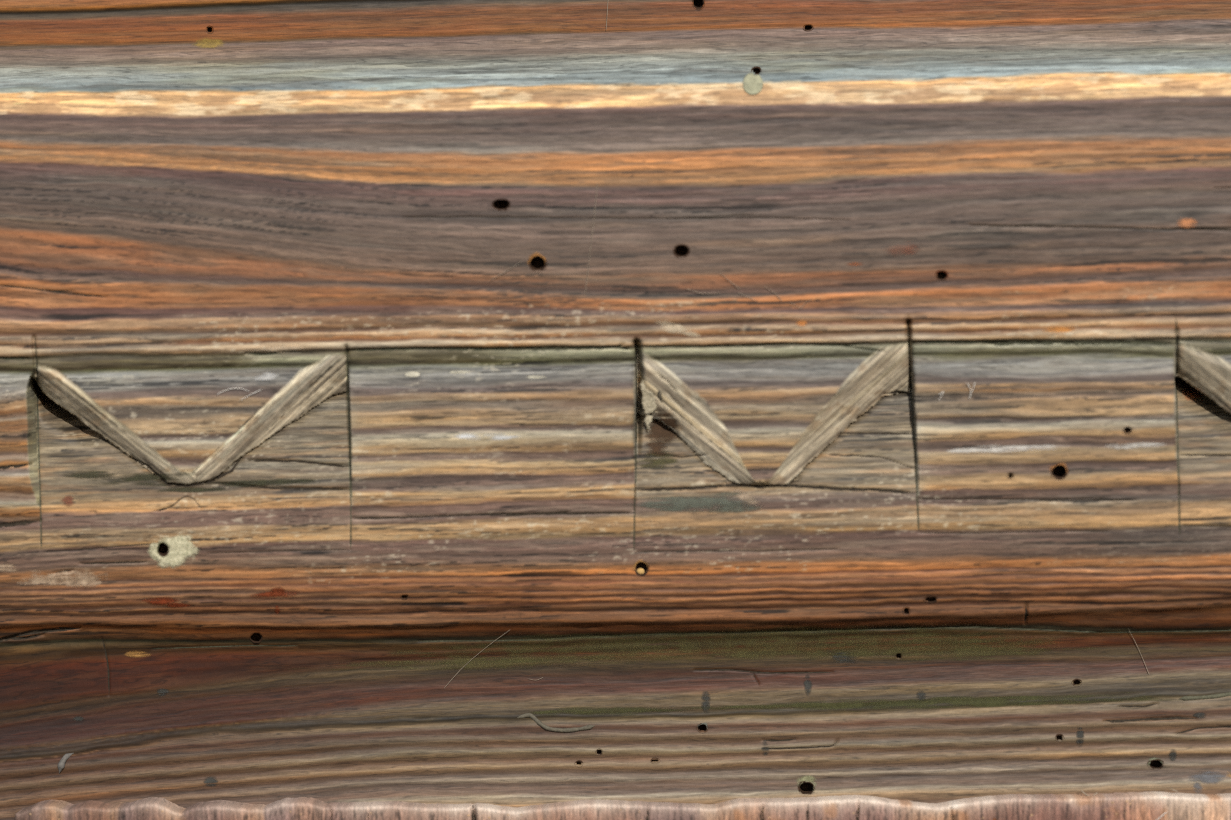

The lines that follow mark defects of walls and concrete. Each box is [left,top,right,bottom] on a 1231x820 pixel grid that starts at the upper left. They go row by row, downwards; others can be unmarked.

crack [0,463,30,471]
crack [133,457,349,512]
crack [355,432,1132,533]
crack [0,520,39,528]
crack [207,547,352,555]
crack [637,546,840,554]
crack [48,543,158,573]